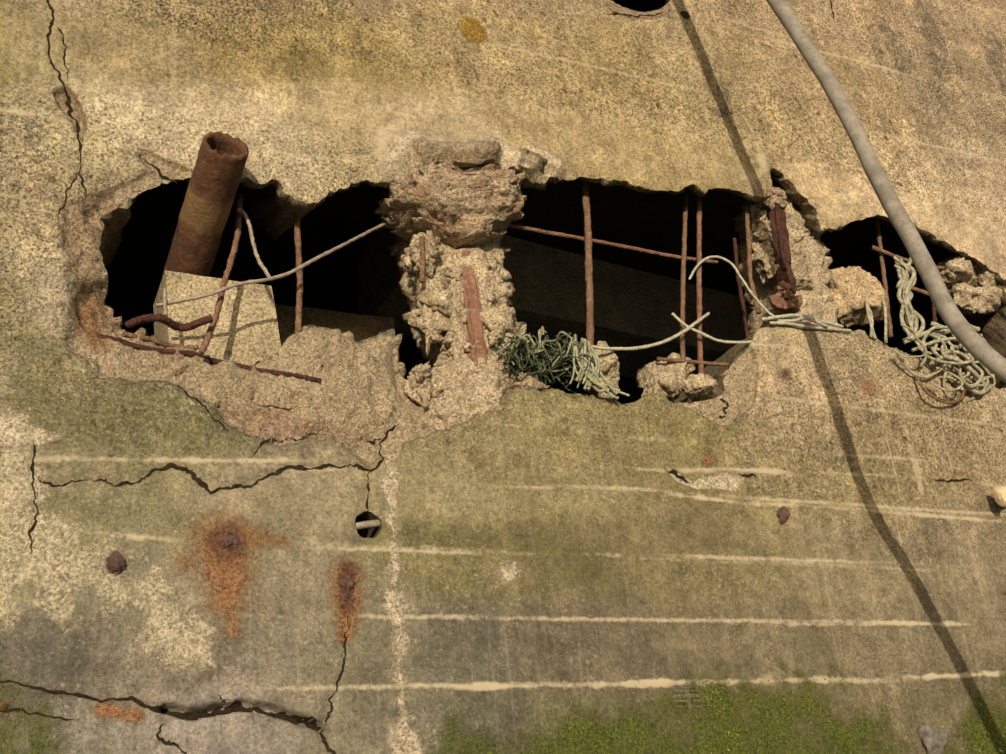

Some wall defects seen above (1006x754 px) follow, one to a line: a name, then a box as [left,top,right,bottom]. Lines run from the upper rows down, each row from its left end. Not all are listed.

crack [46,0,89,214]
spalling [62,150,476,467]
crack [177,385,302,431]
spalling [670,344,759,425]
crack [28,423,399,557]
spalling [665,466,744,491]
corrosion [196,519,287,637]
corrosion [331,562,361,642]
crack [0,616,350,754]